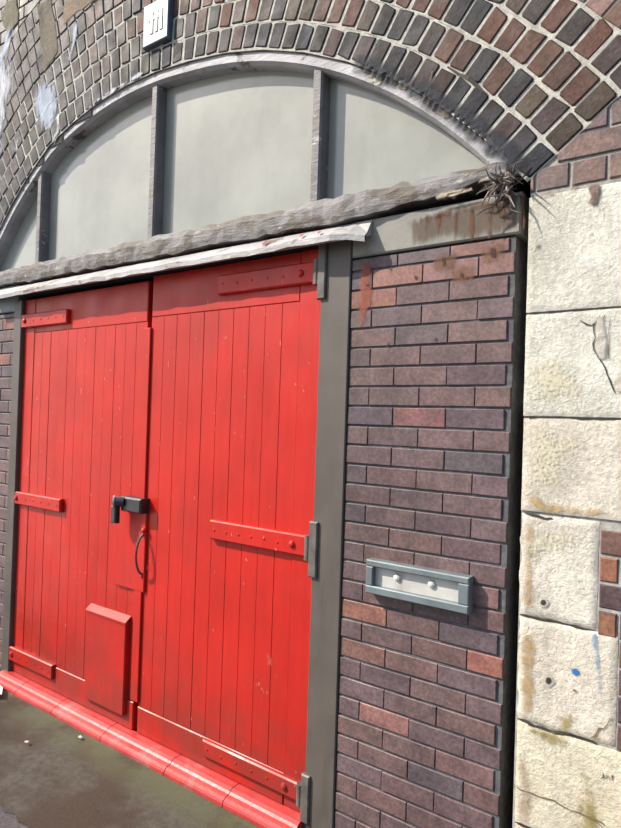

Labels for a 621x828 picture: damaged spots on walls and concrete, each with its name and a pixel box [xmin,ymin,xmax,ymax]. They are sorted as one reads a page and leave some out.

water stain [0,30,13,133]
water stain [34,83,59,141]
corrosion [412,194,524,240]
crack [580,314,621,394]
crack [515,786,605,828]